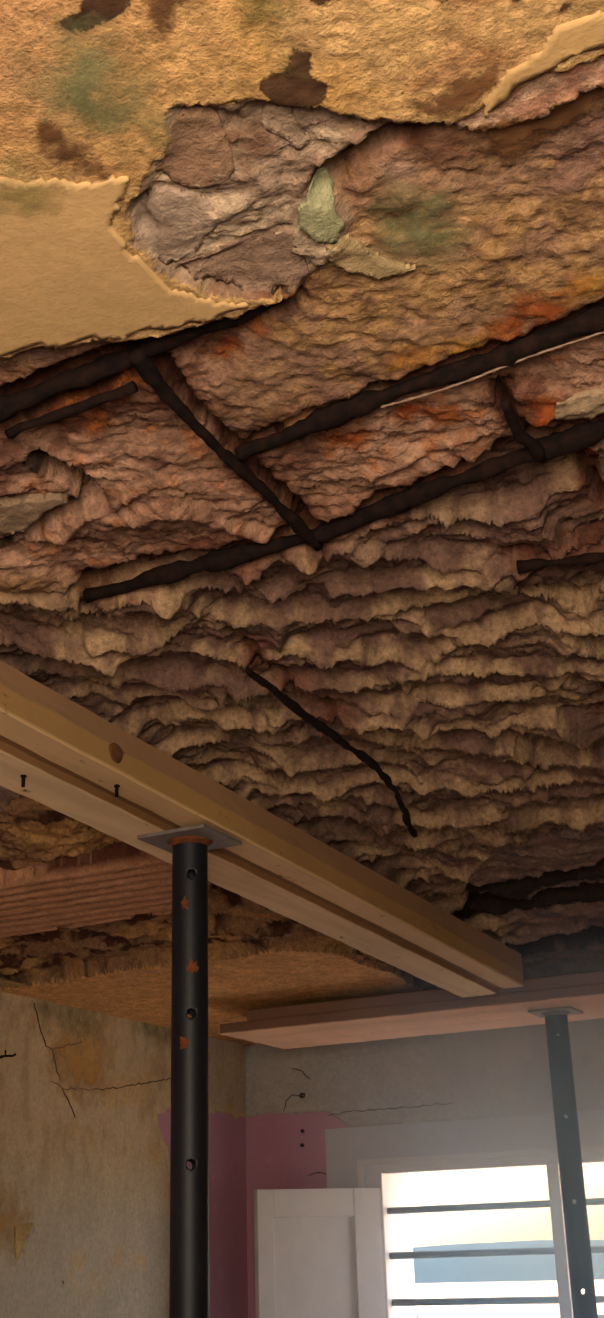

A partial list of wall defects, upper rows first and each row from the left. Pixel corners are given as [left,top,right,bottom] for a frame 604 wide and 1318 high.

peeling [55,0,131,32]
peeling [149,0,183,33]
rust [392,274,604,369]
rust [530,396,561,427]
spalling [0,47,604,990]
peeling [0,913,172,1318]
peeling [208,1018,604,1127]